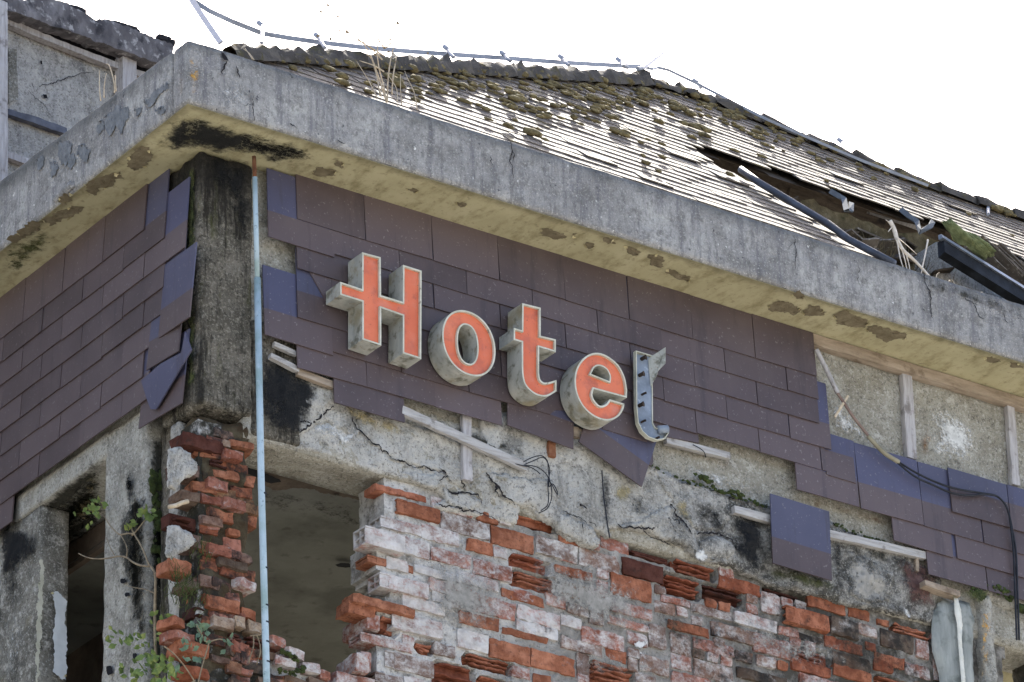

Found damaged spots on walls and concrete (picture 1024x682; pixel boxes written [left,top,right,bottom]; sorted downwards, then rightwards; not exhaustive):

spalling [96,83,168,136]
leakage [161,120,308,238]
leakage [8,235,45,268]
leakage [263,360,317,434]
peeling [167,447,198,491]
crack [300,405,515,519]
peeling [165,525,197,560]
crack [565,504,734,545]
leakage [1,527,45,682]